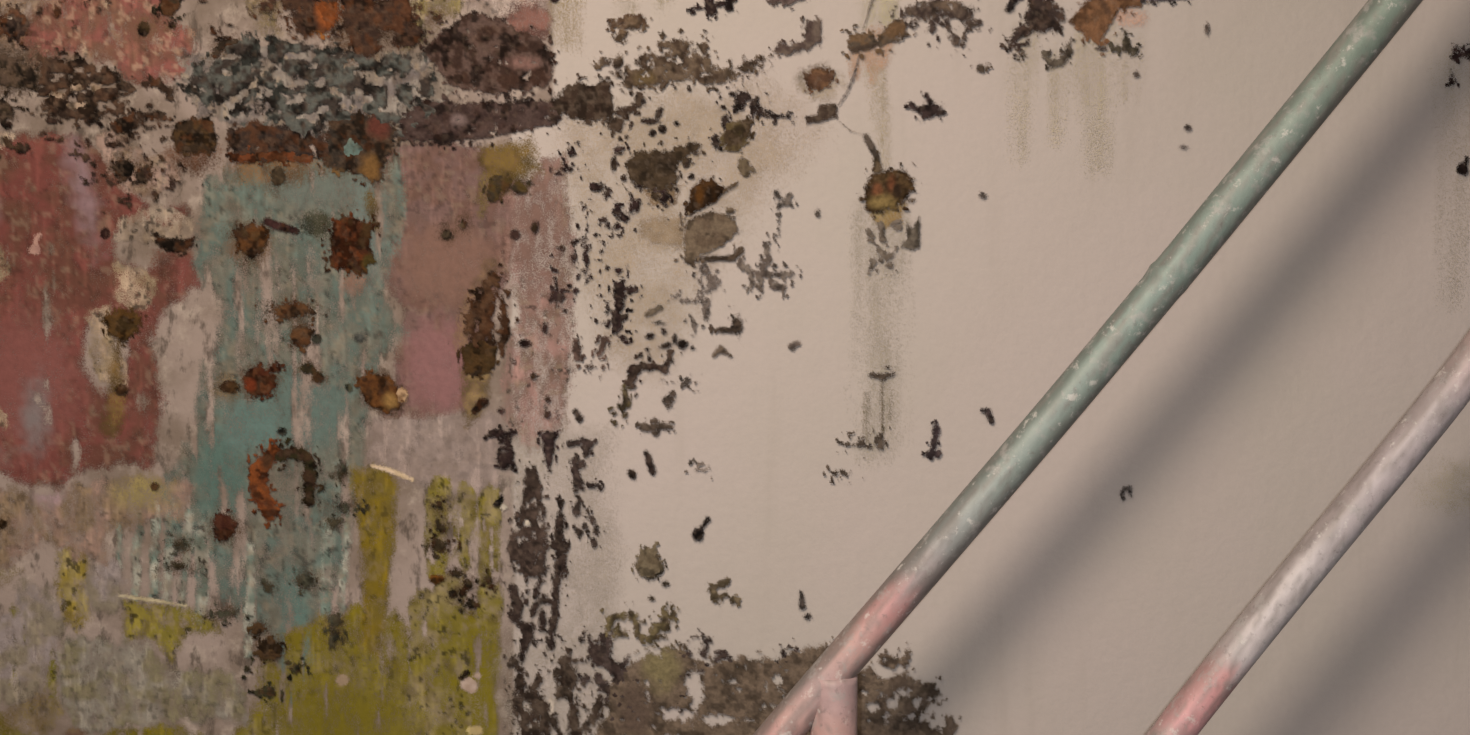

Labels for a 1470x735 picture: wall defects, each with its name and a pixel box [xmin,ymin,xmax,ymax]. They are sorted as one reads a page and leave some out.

rust [129,0,185,49]
rust [202,32,244,67]
rust [272,0,444,77]
rust [790,23,895,173]
crack [837,0,880,160]
peeling [1093,27,1143,77]
rust [1061,0,1190,56]
rust [105,104,401,296]
peeling [0,0,1085,735]
rust [140,427,370,582]
peeling [1119,485,1133,501]
rust [259,561,351,654]